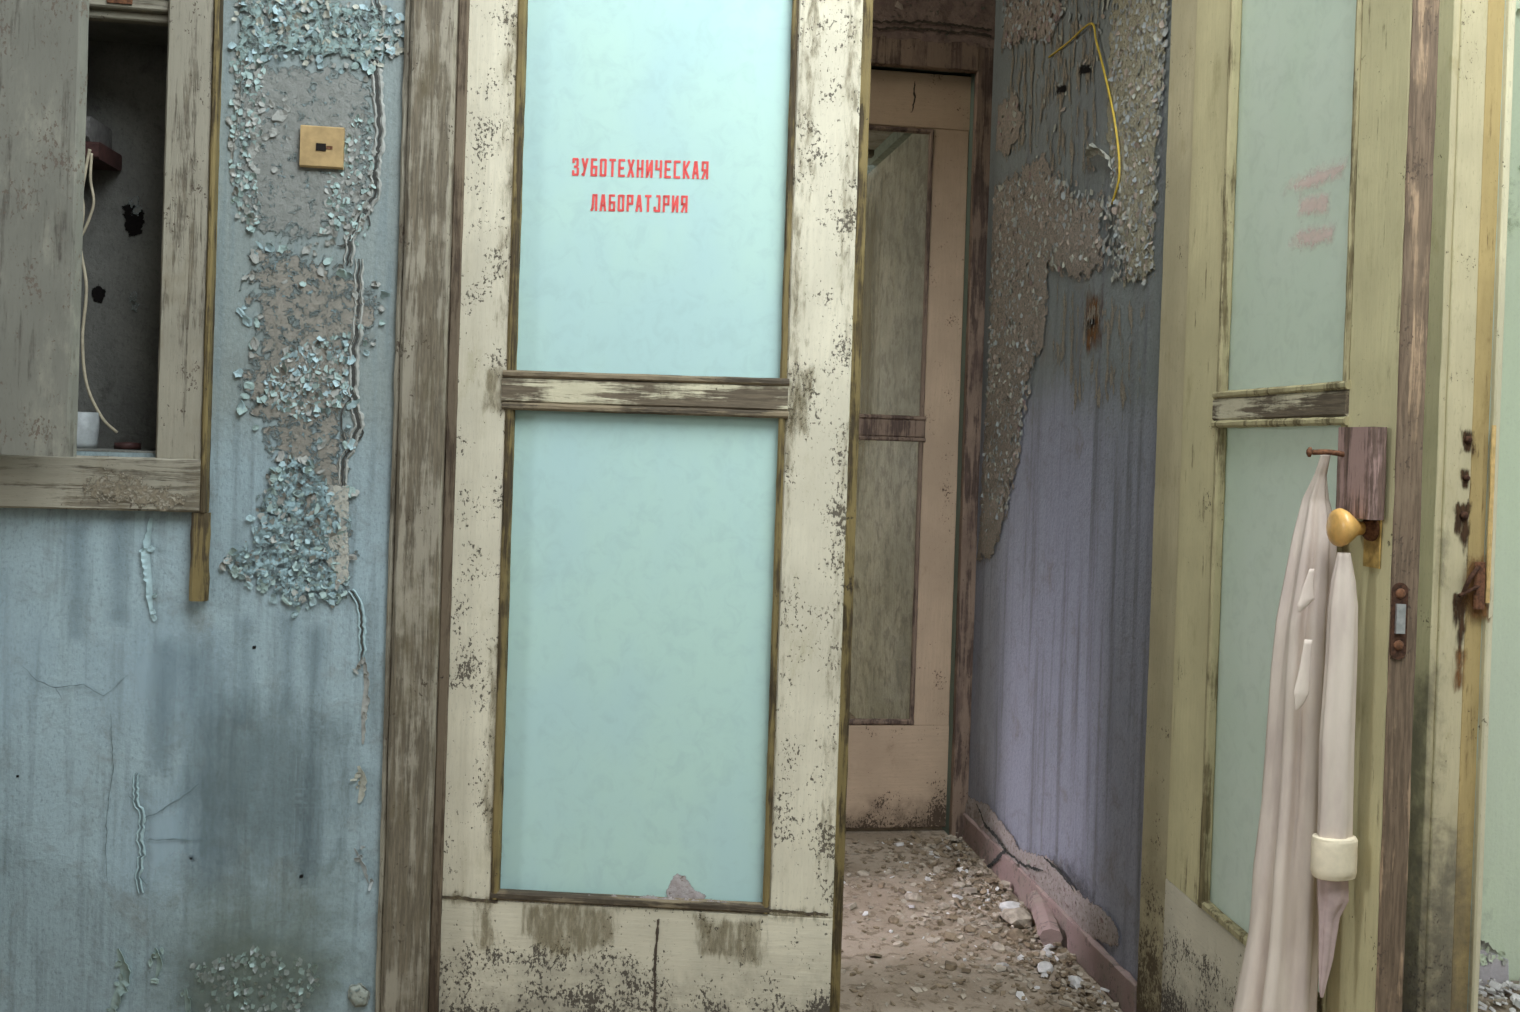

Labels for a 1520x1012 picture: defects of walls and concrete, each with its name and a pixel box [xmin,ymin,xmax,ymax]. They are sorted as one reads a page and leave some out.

peeling [224,53,391,600]
crack [337,0,386,486]
peeling [976,0,1170,563]
rust [1453,430,1490,689]
spalling [1479,940,1509,987]